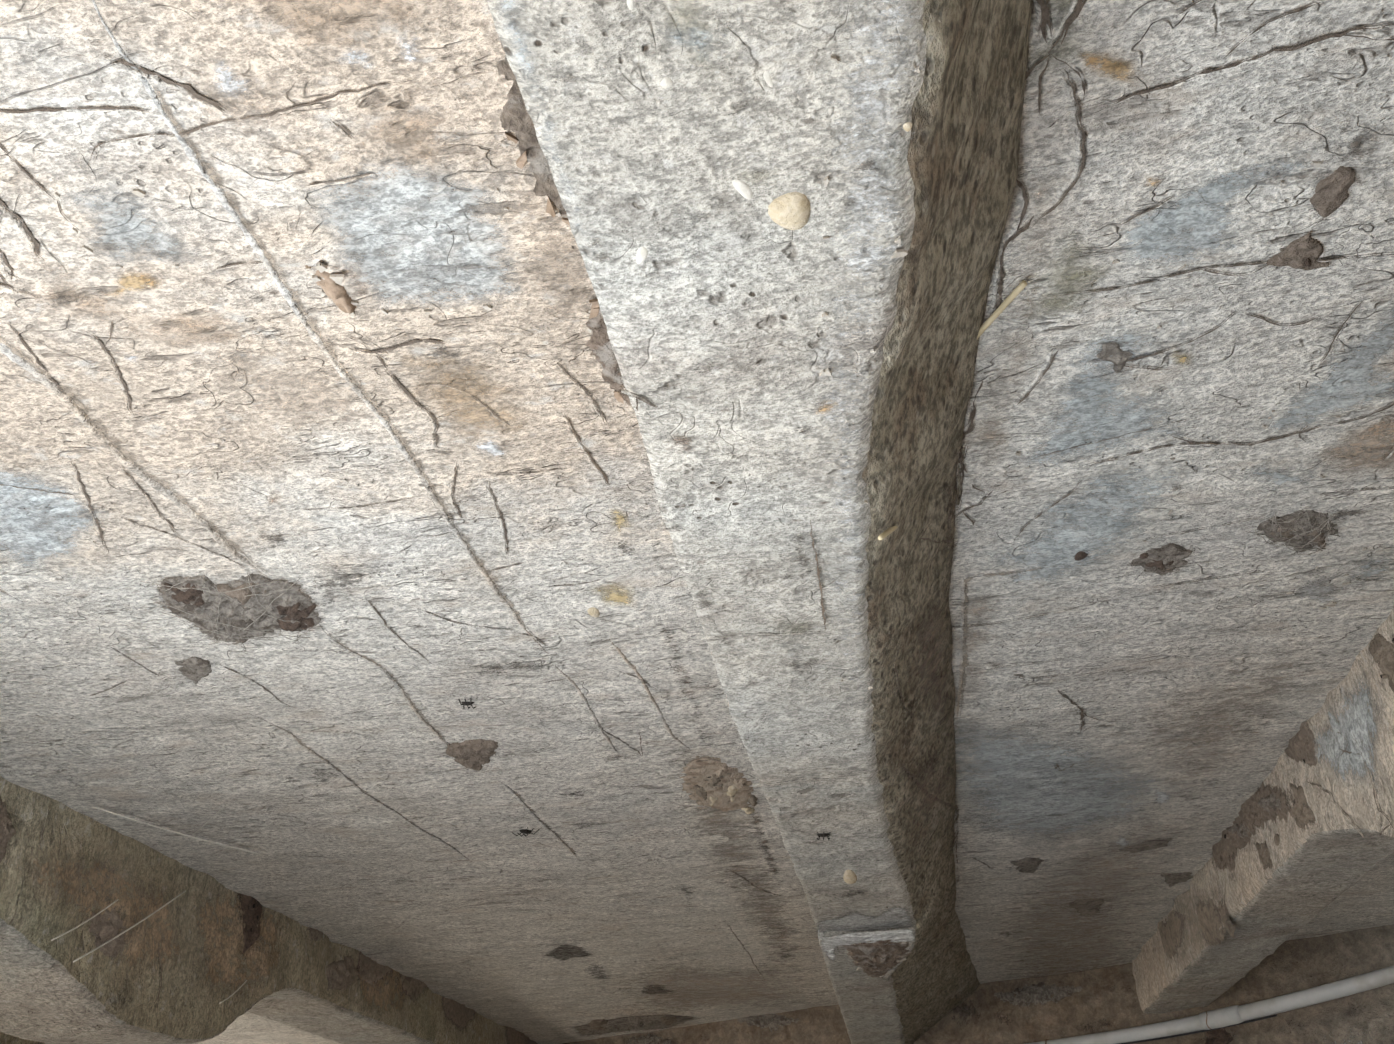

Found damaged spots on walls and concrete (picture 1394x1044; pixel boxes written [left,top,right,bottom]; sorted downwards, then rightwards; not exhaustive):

crack [0,55,418,395]
spalling [497,35,570,226]
crack [989,0,1394,370]
crack [84,321,134,415]
spalling [585,299,631,405]
crack [1014,348,1059,405]
crack [0,457,247,568]
crack [297,335,660,572]
crack [900,381,992,587]
crack [1014,402,1394,543]
crack [364,596,547,666]
spalling [814,907,912,978]